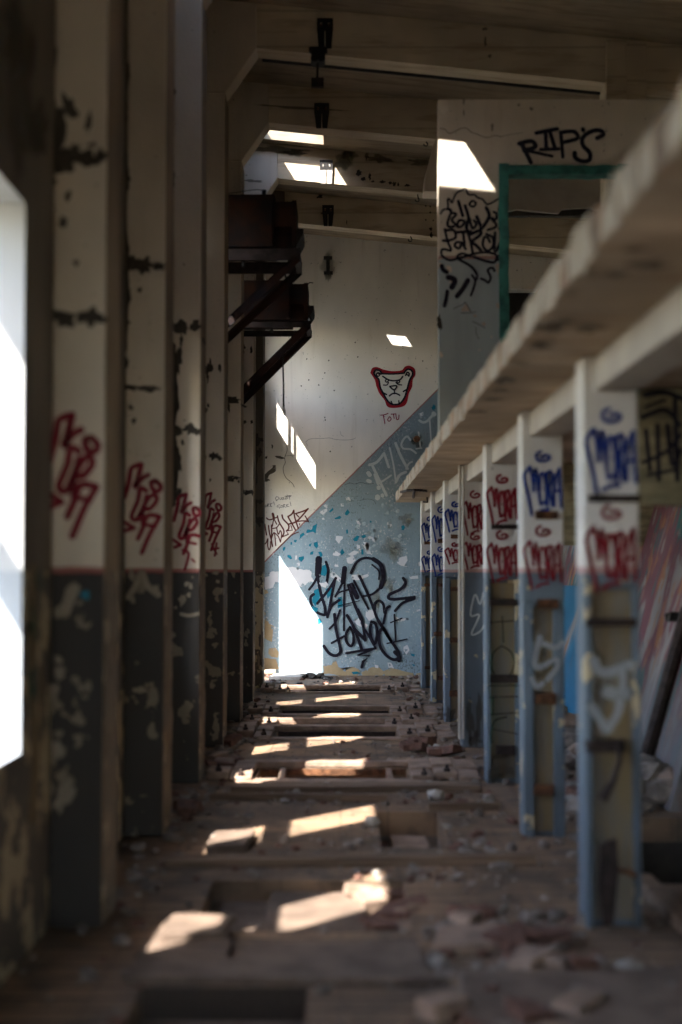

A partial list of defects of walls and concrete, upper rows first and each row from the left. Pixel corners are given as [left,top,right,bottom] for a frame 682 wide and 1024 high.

spalling [54,92,108,202]
spalling [126,232,166,305]
spalling [52,306,108,328]
spalling [125,319,206,505]
peeling [53,581,81,619]
peeling [125,563,244,822]
peeling [51,777,76,816]